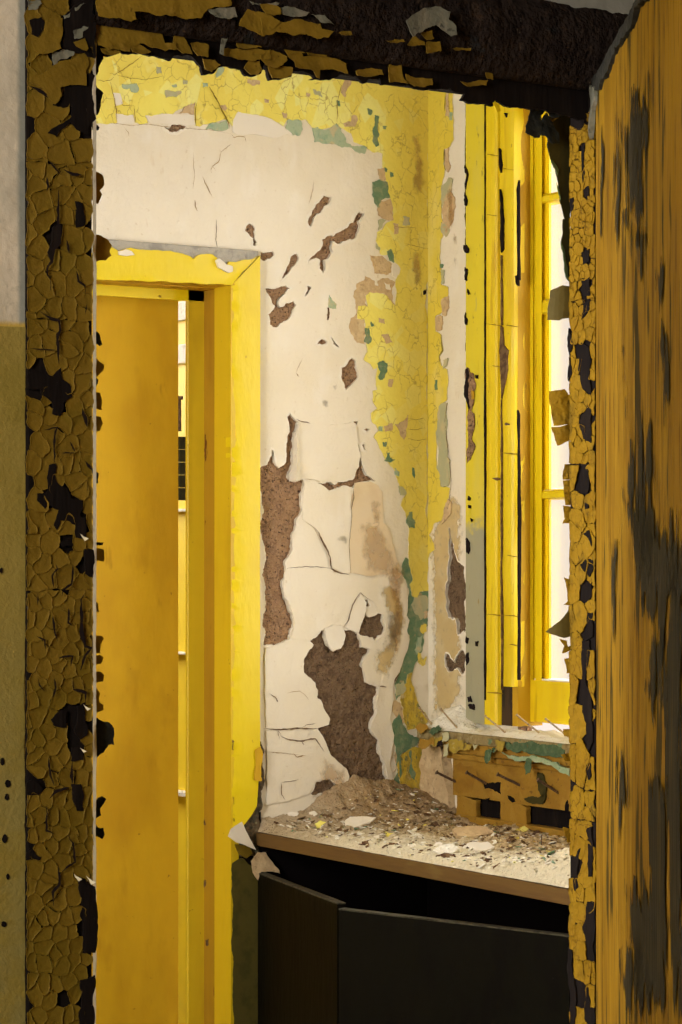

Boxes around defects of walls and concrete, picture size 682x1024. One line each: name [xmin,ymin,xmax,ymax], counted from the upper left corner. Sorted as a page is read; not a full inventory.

peeling [239,1,334,39]
peeling [388,6,471,53]
peeling [24,0,238,1024]
crack [287,490,360,626]
peeling [96,25,596,1024]
crack [269,691,324,798]